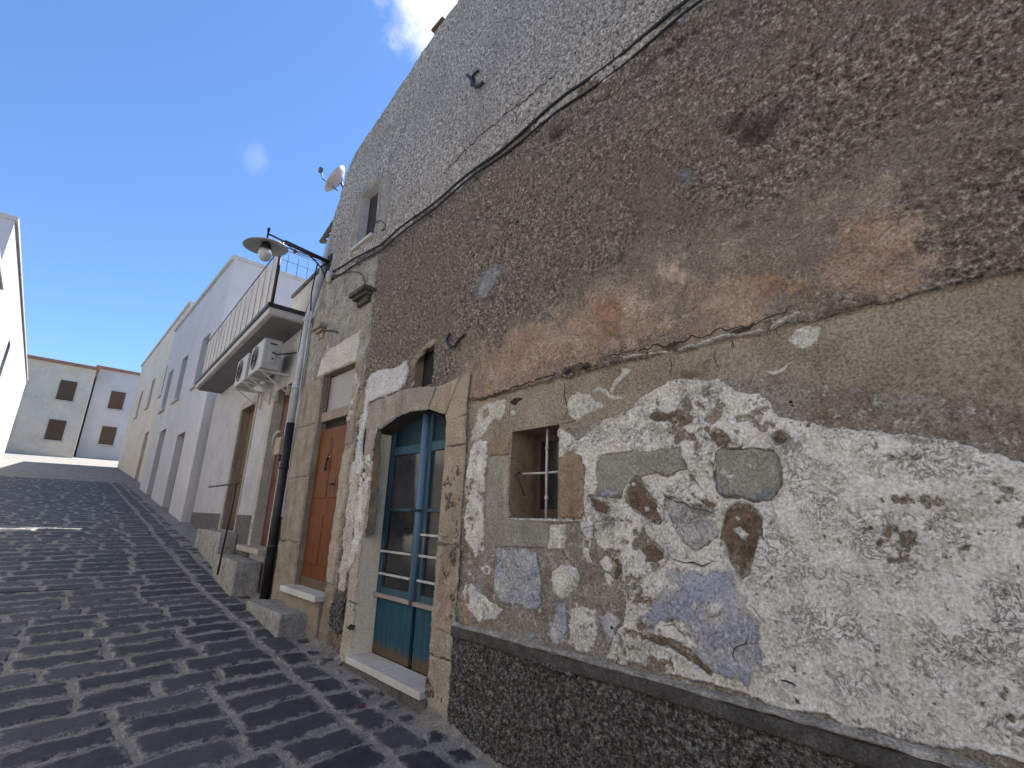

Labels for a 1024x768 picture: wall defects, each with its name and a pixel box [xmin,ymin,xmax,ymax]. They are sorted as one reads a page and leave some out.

flaking render [338,360,409,593]
crack [474,374,576,426]
crack [599,301,806,374]
flaking render [434,311,1024,763]